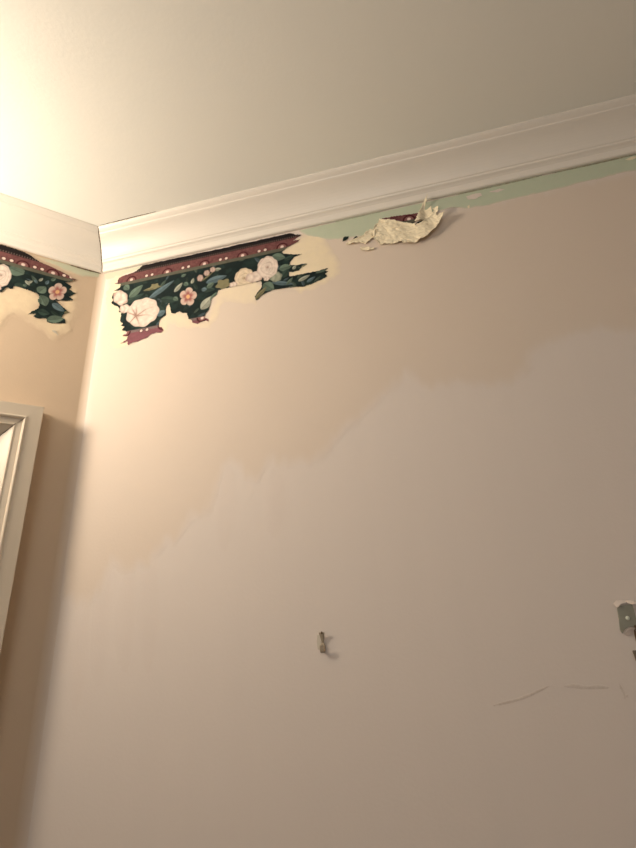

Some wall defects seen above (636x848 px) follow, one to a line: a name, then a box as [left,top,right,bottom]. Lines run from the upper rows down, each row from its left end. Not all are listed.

peeling [299,155,636,240]